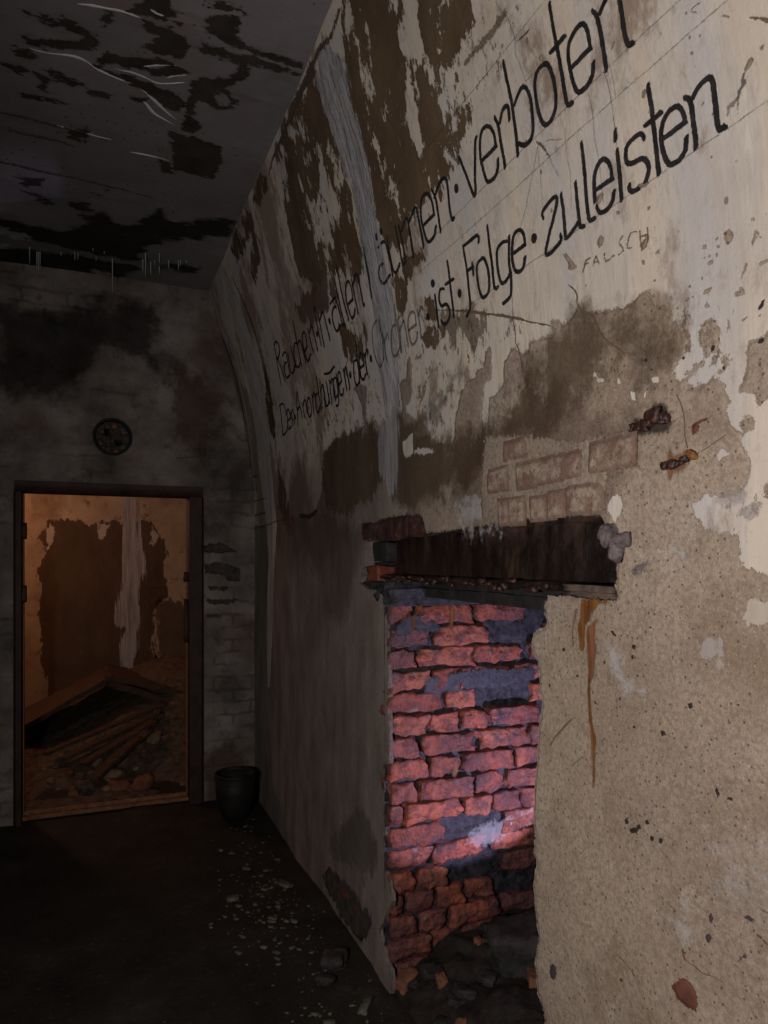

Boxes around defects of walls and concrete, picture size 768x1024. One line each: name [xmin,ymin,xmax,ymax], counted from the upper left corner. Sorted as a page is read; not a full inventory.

damp [0,171,268,288]
damp [275,0,603,516]
corrosion [633,403,670,436]
corrosion [667,449,699,480]
peeling [254,277,768,1024]
corrosion [578,598,606,786]